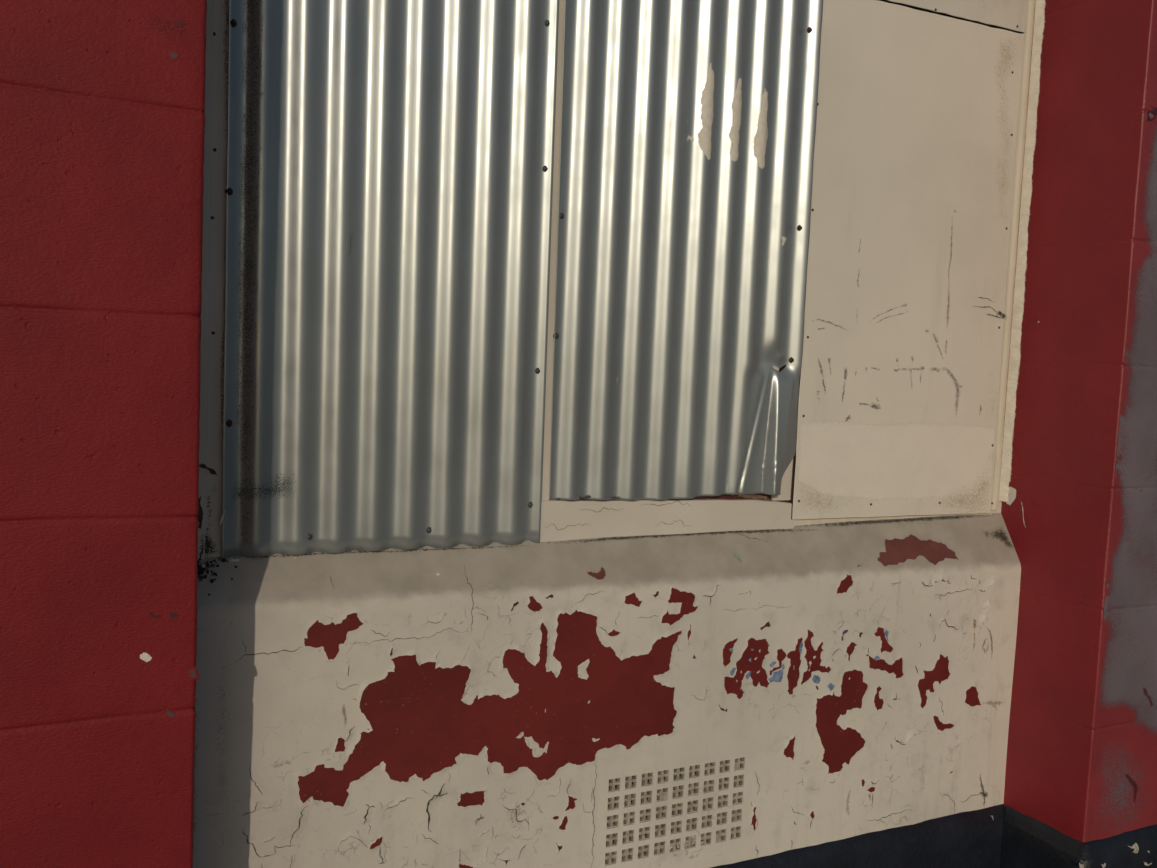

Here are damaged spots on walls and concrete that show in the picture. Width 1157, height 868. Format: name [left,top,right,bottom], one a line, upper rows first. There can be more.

peeling [875,531,961,587]
crack [337,567,488,689]
crack [903,575,990,674]
peeling [293,584,701,812]
peeling [718,620,955,776]
peeling [963,682,983,710]
crack [205,762,311,868]
crack [363,779,451,864]
crack [476,763,600,868]